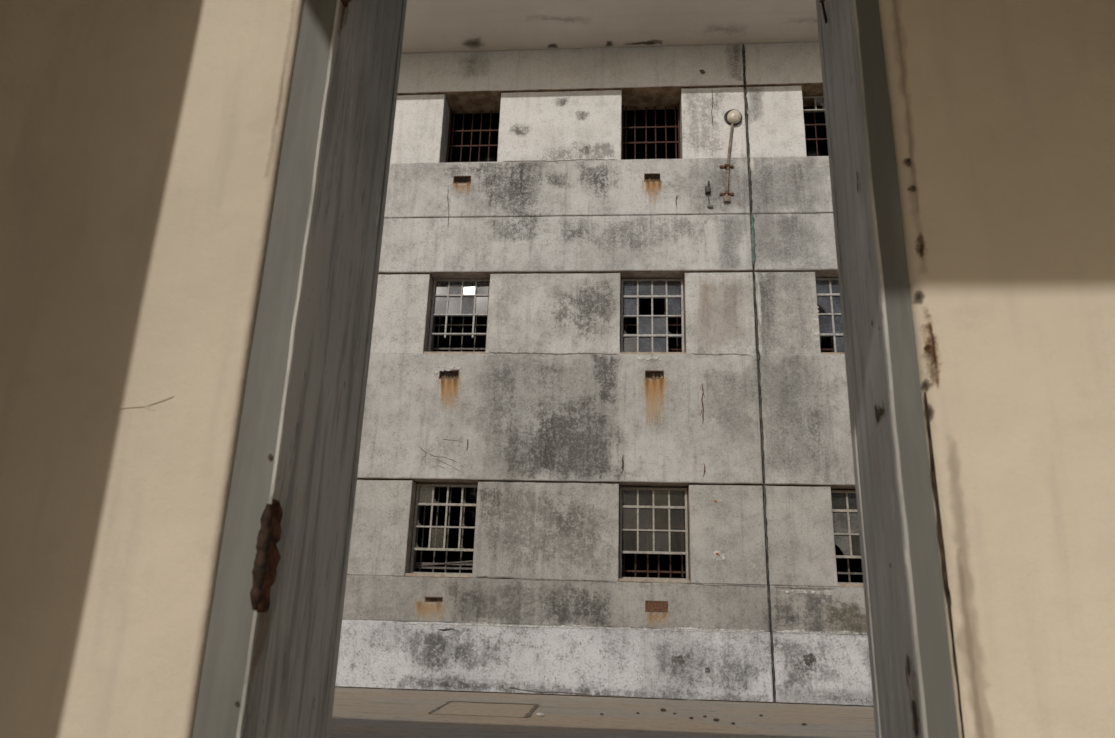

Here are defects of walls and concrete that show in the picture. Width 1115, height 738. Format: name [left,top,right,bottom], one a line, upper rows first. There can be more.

corrosion [924,314,940,385]
corrosion [441,379,457,403]
corrosion [644,377,666,416]